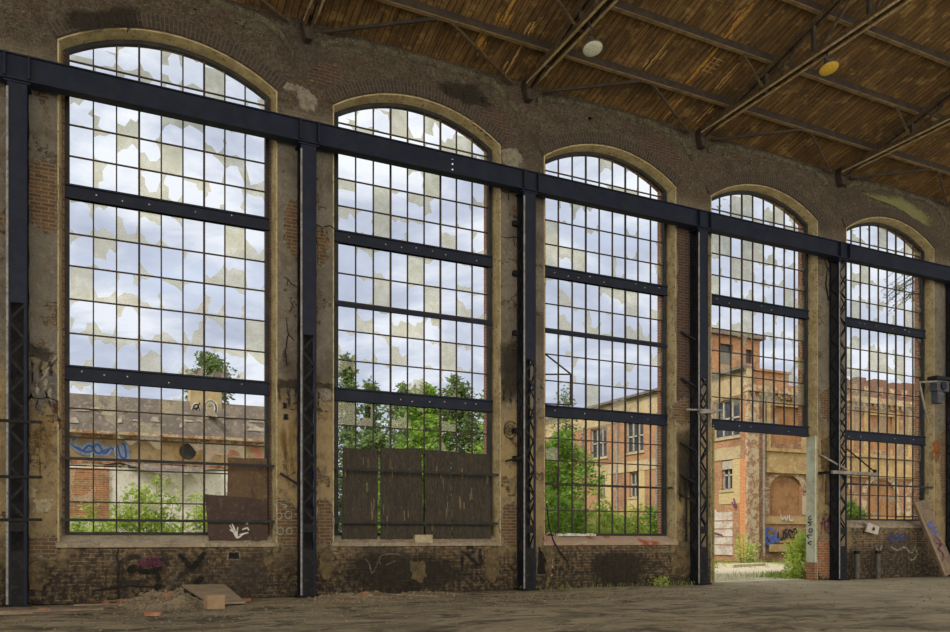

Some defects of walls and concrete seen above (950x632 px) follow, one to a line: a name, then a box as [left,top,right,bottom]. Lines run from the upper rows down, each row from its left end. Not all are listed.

peeling [283,82,318,113]
spalling [29,155,62,237]
spalling [316,224,331,269]
crack [283,276,297,365]
spalling [670,226,692,427]
peeling [29,370,58,418]
spalling [316,497,335,547]
spalling [498,500,517,548]